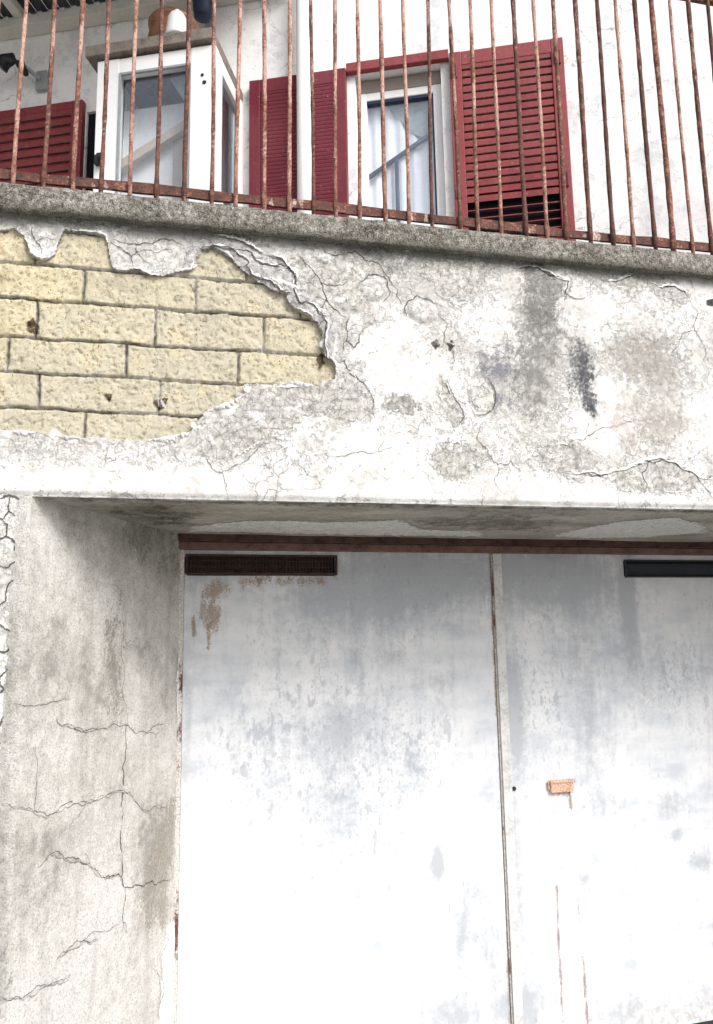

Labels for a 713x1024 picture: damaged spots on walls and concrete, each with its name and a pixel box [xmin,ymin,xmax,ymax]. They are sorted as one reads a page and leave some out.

spalling [25,238,47,259]
spalling [26,318,40,335]
peeling [149,233,423,464]
leakage [570,338,597,417]
spalling [49,429,79,440]
crack [203,442,269,495]
crack [563,455,713,497]
corrosion [192,576,324,649]
crack [0,494,174,1001]